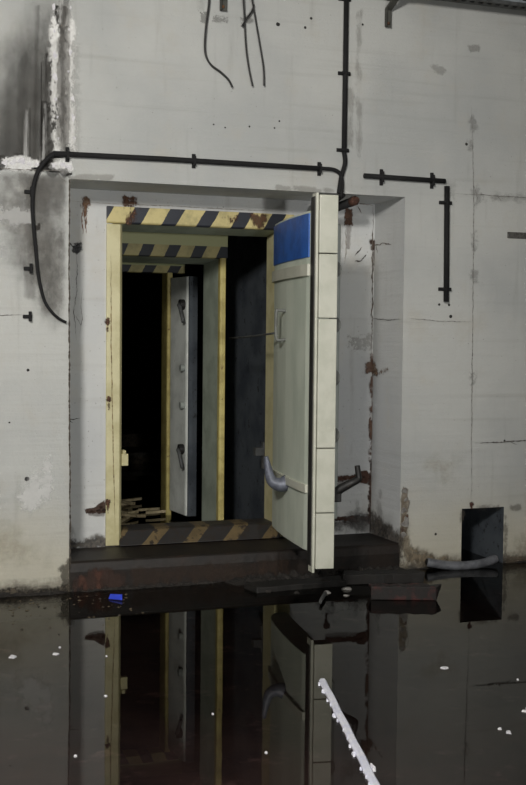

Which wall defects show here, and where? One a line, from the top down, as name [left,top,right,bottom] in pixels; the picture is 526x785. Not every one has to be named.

damp [0,155,75,174]
corrosion [122,195,137,226]
corrosion [250,213,267,229]
corrosion [344,197,360,226]
corrosion [334,354,388,524]
damp [69,535,119,548]
damp [0,559,70,594]